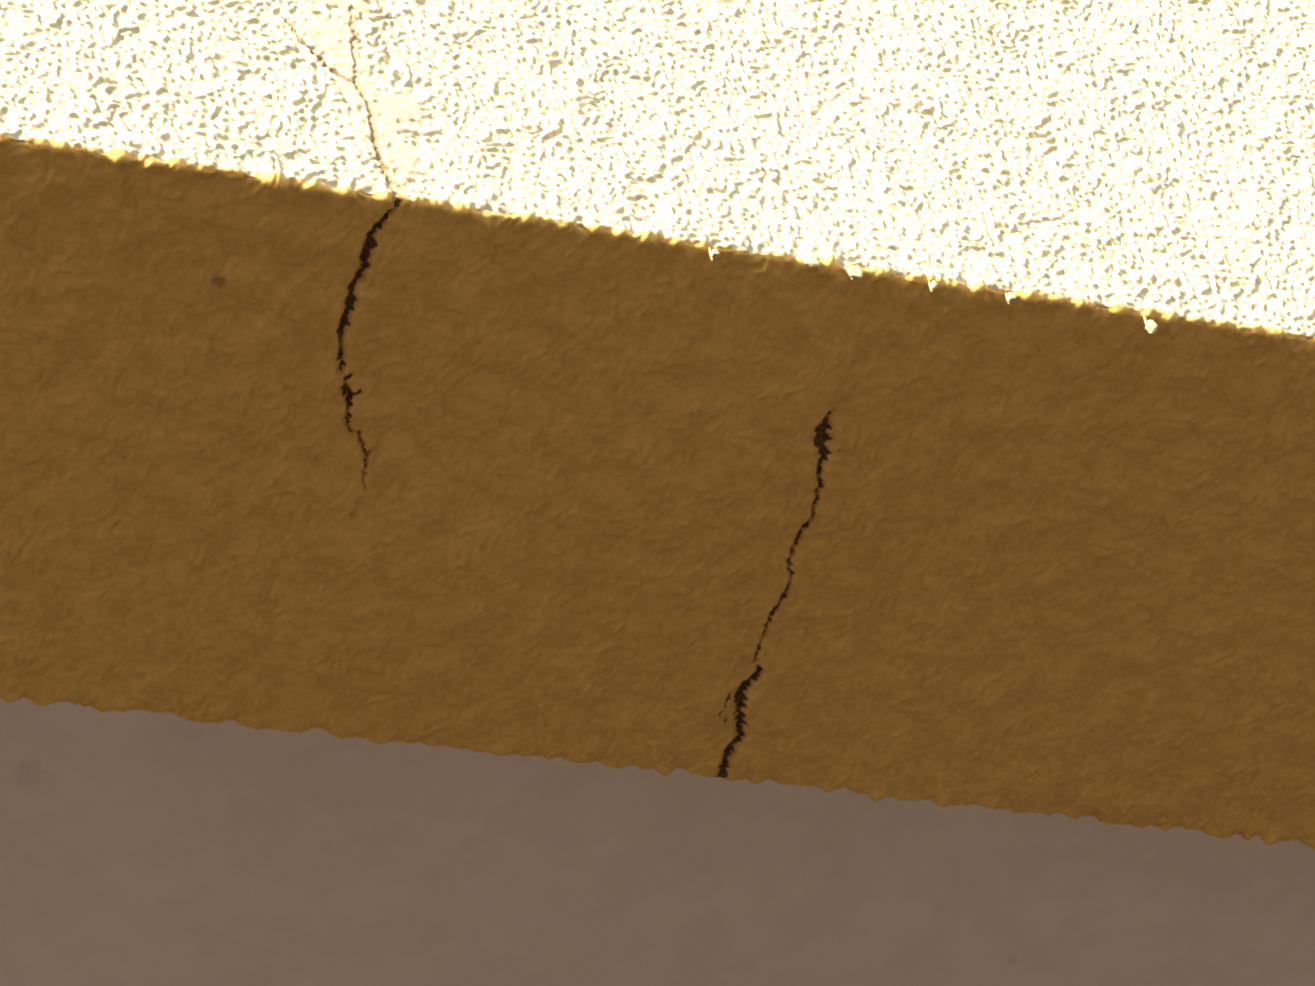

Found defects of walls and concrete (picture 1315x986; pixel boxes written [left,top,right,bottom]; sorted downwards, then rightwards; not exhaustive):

crack [285,6,399,482]
crack [715,411,840,778]